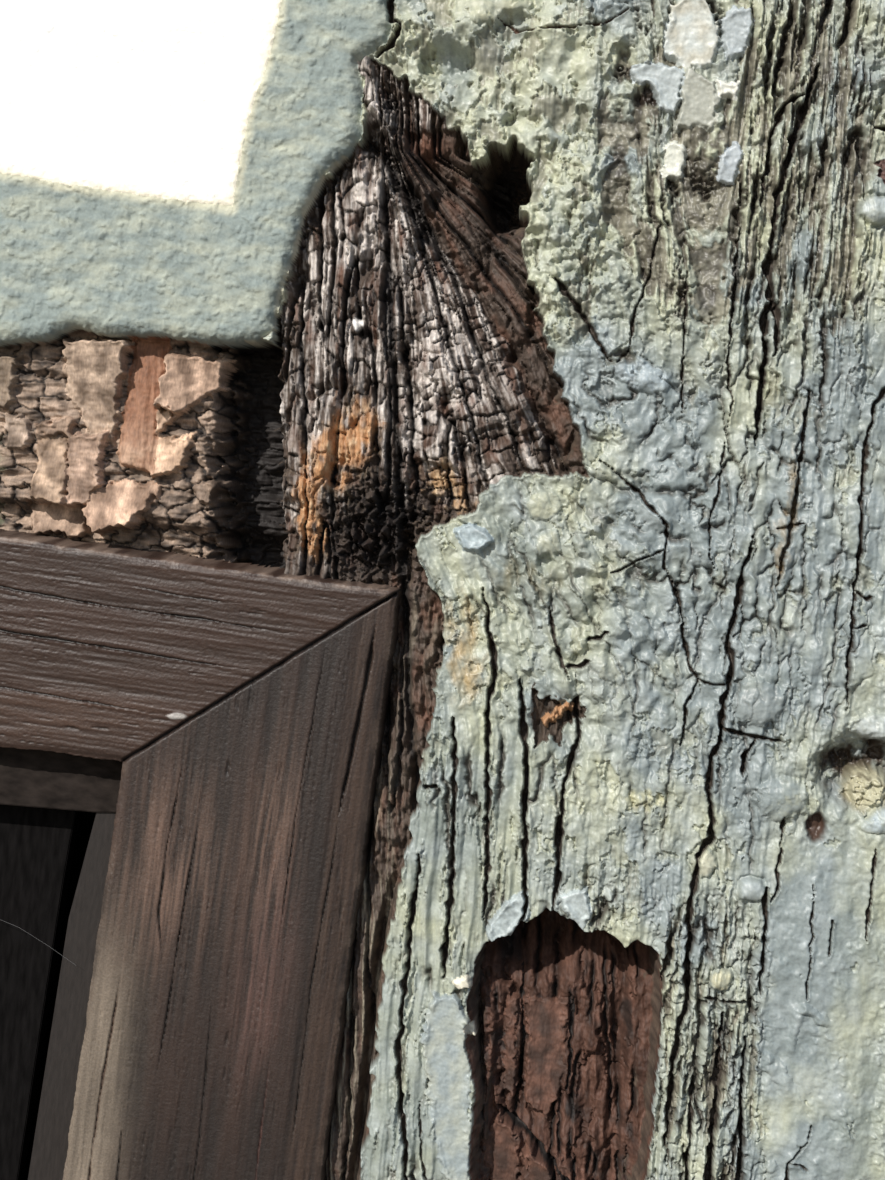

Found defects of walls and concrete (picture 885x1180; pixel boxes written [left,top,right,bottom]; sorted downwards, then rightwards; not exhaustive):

peeling [874,160,885,184]
crack [554,224,661,365]
peeling [0,336,240,539]
crack [845,387,885,714]
crack [599,64,820,1180]
peeling [531,683,587,755]
crack [394,587,611,1180]
peeling [486,891,532,942]
crack [805,880,835,1002]
crack [865,848,878,944]
peeling [498,991,570,1120]
peeling [479,1110,589,1180]